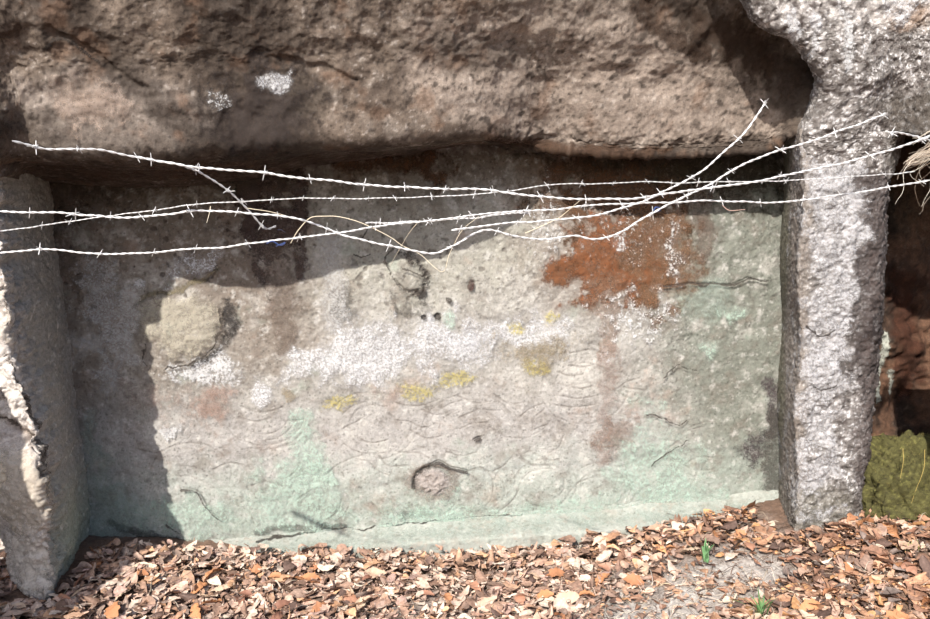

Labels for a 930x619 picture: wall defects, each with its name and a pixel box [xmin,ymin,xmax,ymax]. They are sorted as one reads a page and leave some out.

damp [213,167,310,285]
rust [488,136,711,329]
crack [663,277,768,288]
spalling [411,461,468,495]